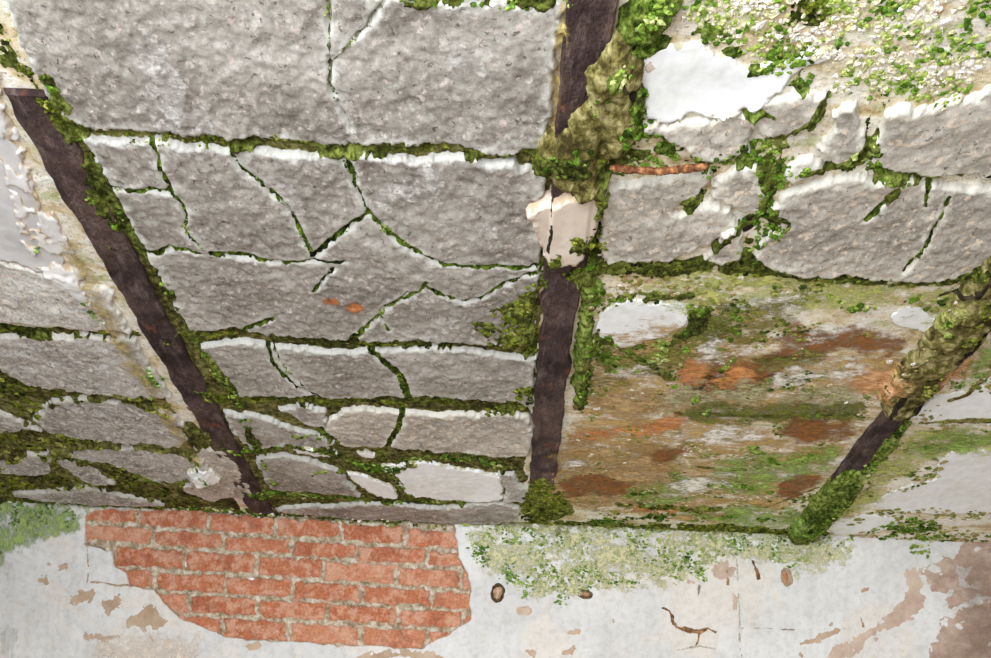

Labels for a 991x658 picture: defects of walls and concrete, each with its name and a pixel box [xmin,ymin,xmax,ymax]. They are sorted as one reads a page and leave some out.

crack [324,0,386,134]
crack [863,200,886,222]
crack [902,177,951,272]
crack [108,132,554,447]
rust [772,321,906,361]
rust [676,357,788,394]
rust [843,367,903,406]
rust [781,417,854,444]
peeling [38,563,68,585]
peeling [69,589,121,616]
flaking render [83,509,472,658]
peeling [799,542,991,658]